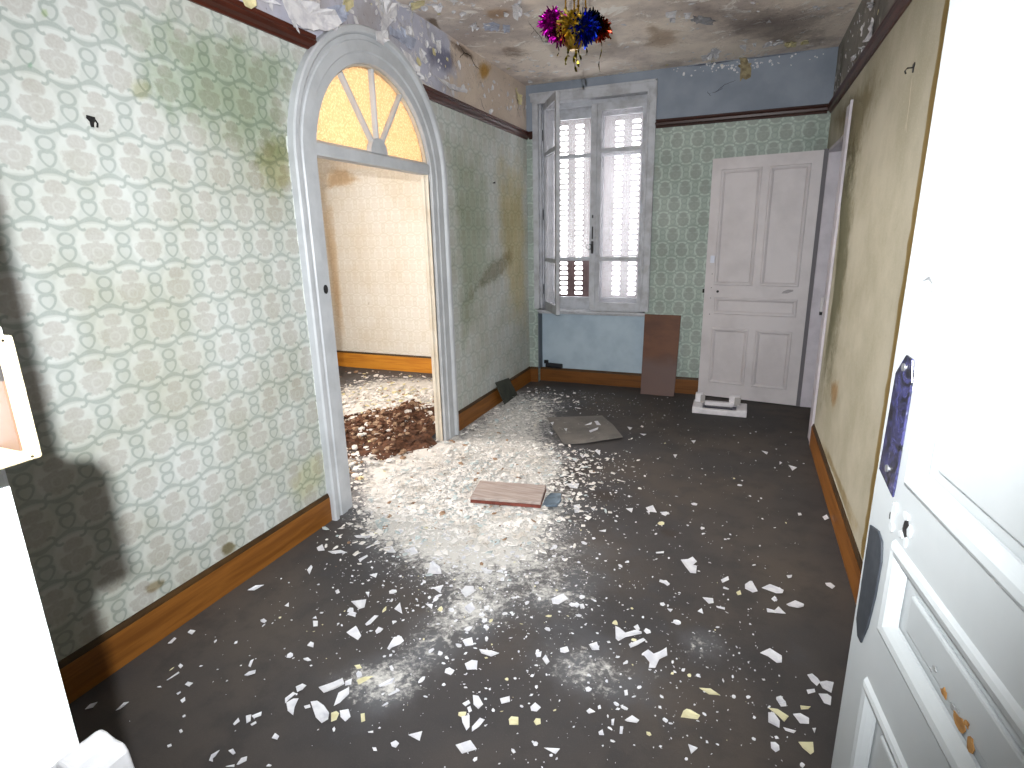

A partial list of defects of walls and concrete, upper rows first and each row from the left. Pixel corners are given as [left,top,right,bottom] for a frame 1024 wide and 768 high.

peeling [243,0,568,117]
peeling [835,0,879,90]